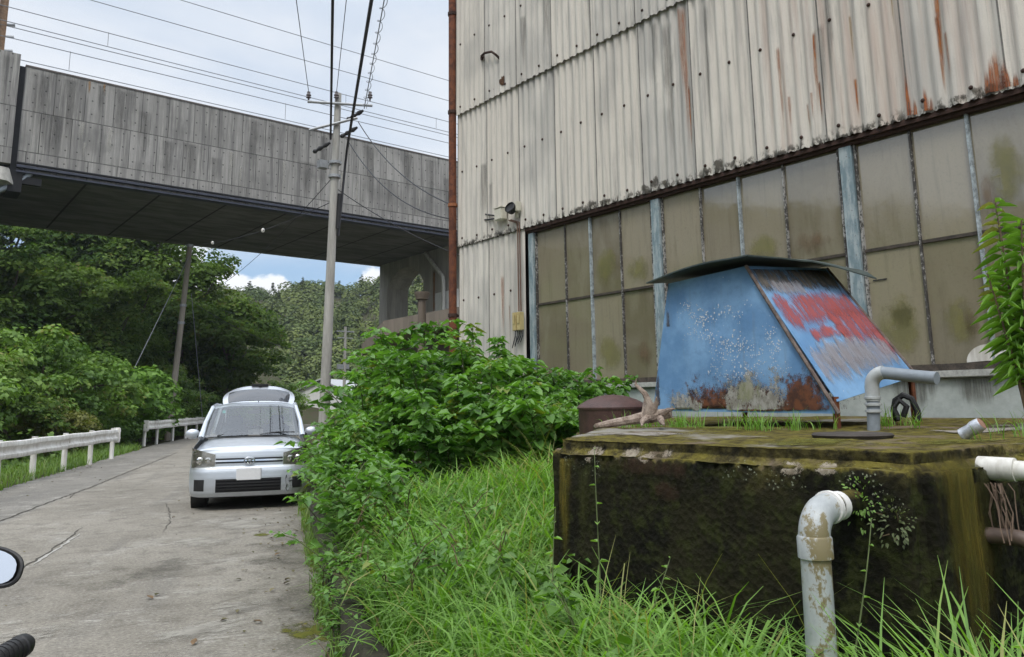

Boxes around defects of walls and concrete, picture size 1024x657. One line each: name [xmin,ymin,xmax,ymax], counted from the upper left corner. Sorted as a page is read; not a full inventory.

corrosion [935,0,949,75]
corrosion [678,12,692,139]
corrosion [808,34,822,114]
corrosion [905,83,933,116]
corrosion [984,59,1019,94]
water stain [703,159,735,173]
peeling [669,298,899,411]
crack [0,453,175,521]
spalling [780,461,836,476]
crack [24,528,81,567]
water stain [943,462,997,625]